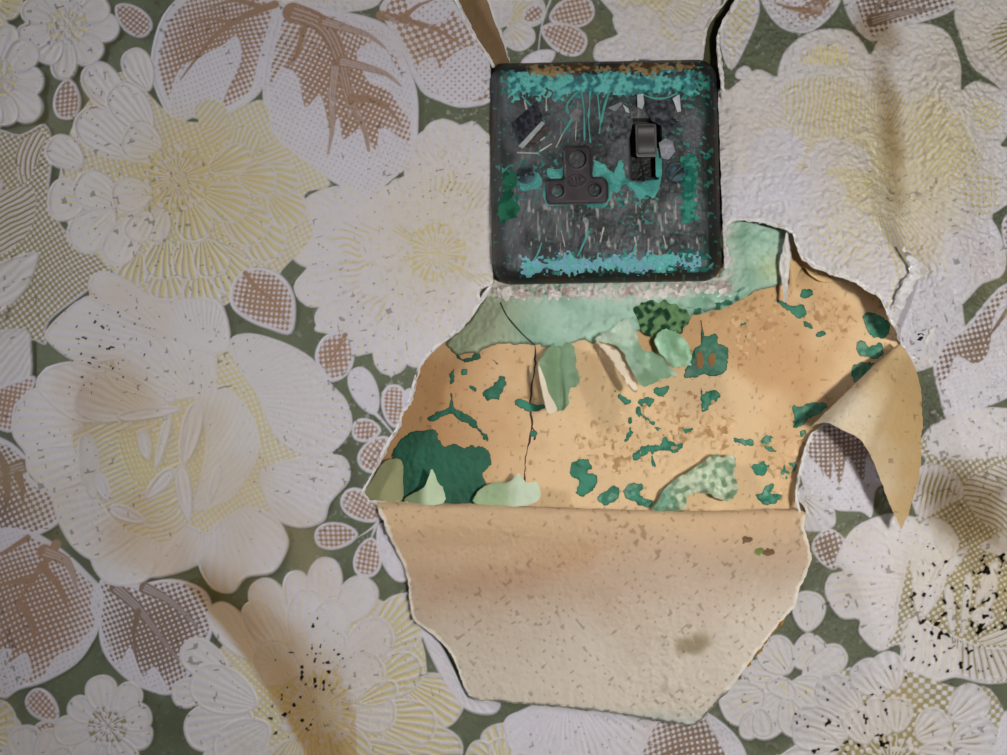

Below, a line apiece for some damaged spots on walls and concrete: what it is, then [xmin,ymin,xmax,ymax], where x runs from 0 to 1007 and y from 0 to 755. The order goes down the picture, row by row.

peeling [364,458,446,506]
peeling [446,220,857,506]